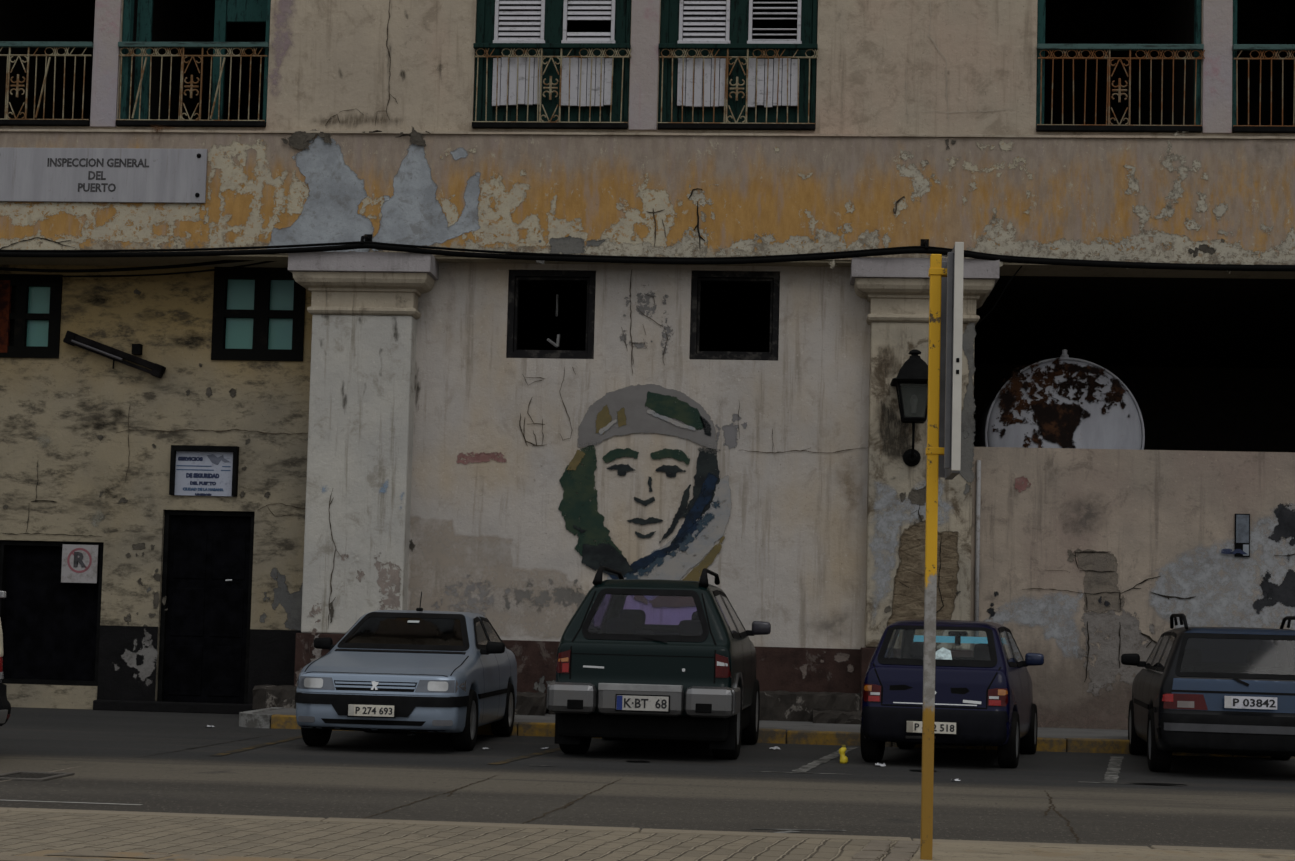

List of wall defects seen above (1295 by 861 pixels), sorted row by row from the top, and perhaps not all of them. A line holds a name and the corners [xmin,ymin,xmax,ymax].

peeling [0,129,332,252]
flaking render [400,126,426,146]
peeling [439,169,891,268]
peeling [894,139,1036,224]
peeling [966,131,1295,273]
peeling [114,568,168,686]
crack [258,489,342,626]
flaking render [884,486,960,646]
flaking render [1067,549,1157,697]
flaking render [1253,503,1295,614]